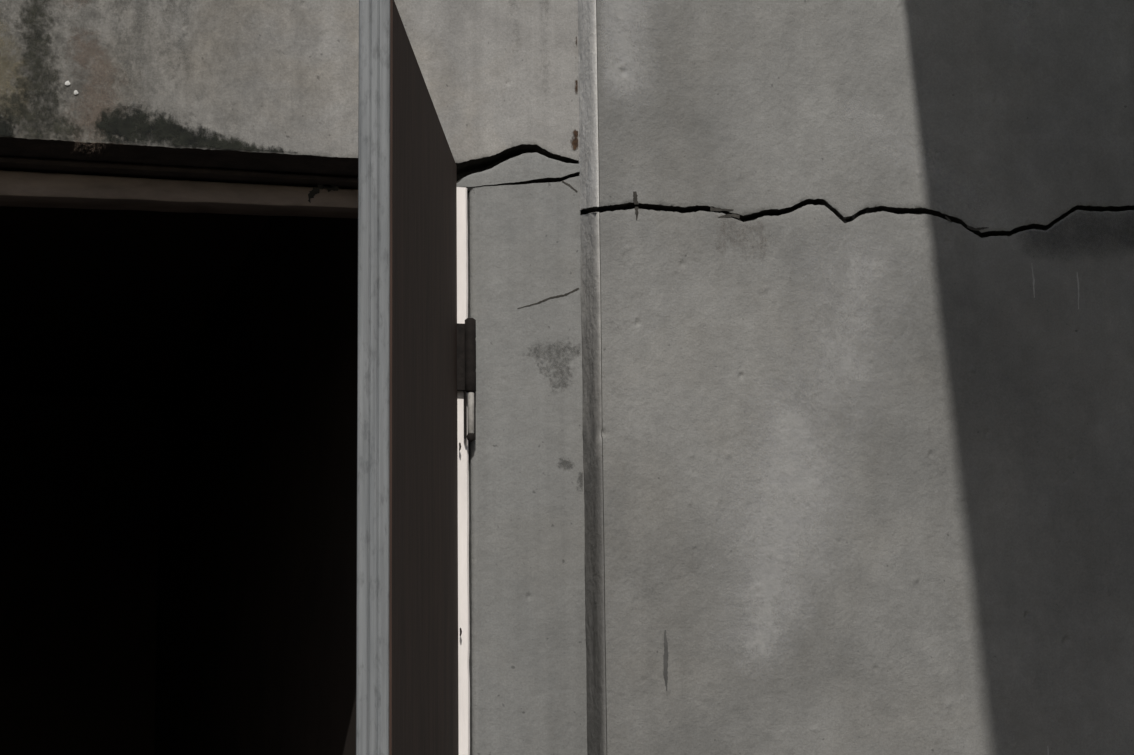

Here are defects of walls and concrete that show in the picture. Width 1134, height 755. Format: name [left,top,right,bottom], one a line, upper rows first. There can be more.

leakage [0,0,297,153]
crack [456,144,1134,238]
crack [517,288,579,309]